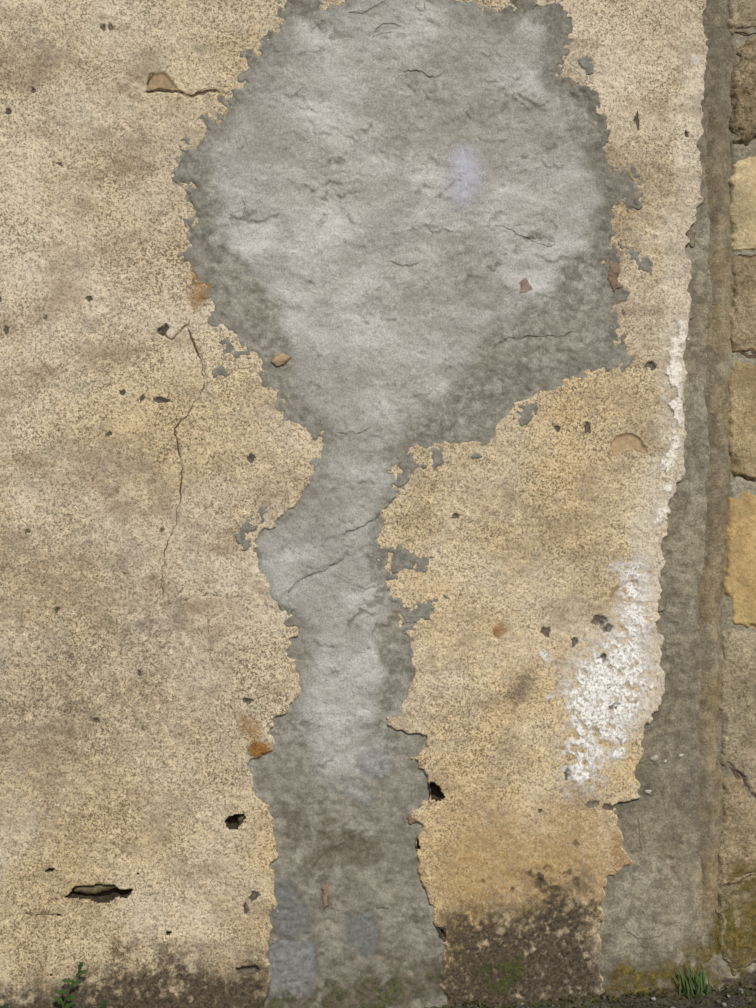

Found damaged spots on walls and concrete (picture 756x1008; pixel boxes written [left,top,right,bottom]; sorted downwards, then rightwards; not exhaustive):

crack [158,324,220,675]
spalling [169,0,719,1008]
damp [547,562,655,791]
damp [0,951,300,1008]
damp [312,871,603,1008]